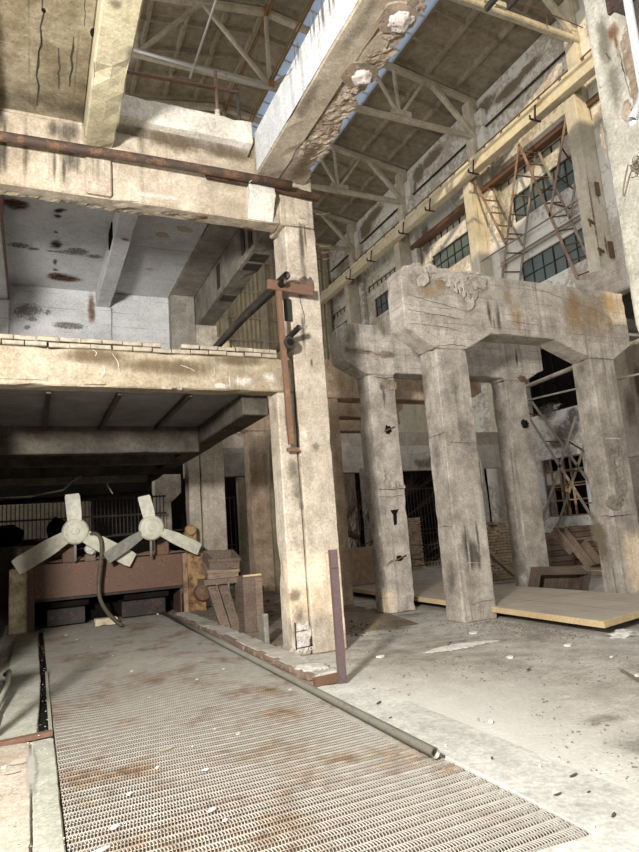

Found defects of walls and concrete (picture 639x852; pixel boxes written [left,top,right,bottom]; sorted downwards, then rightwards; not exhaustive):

crack [36,0,85,106]
spalling [297,0,429,164]
peeling [412,145,442,196]
peeling [406,226,488,311]